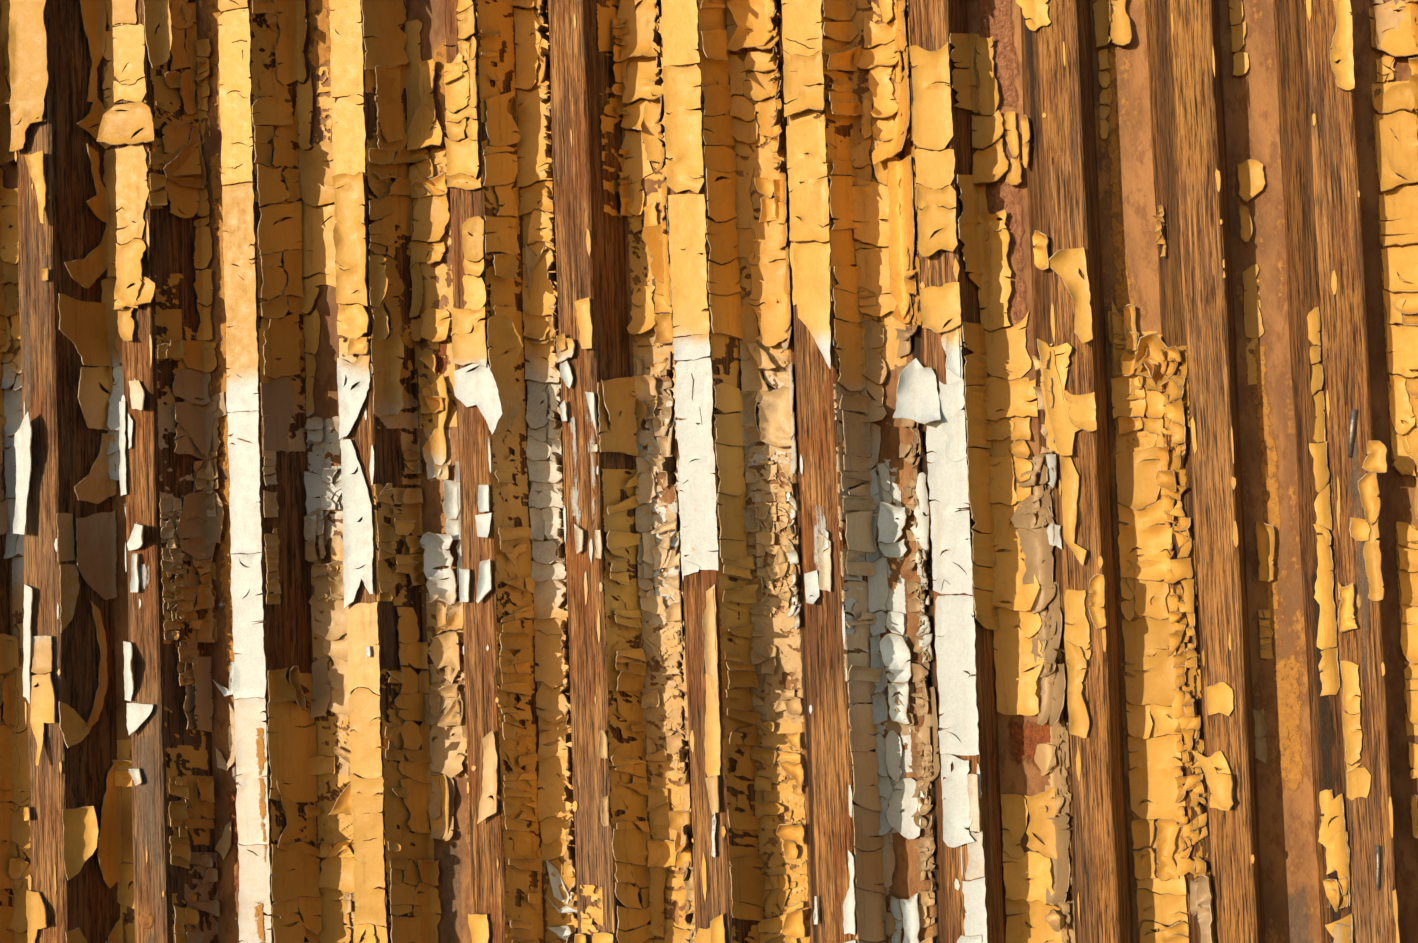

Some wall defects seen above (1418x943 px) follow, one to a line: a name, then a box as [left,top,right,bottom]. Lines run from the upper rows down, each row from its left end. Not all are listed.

corrosion [978,0,1019,107]
peeling [1092,0,1132,139]
peeling [1228,0,1249,76]
corrosion [990,176,1027,320]
peeling [1153,205,1166,257]
peeling [1237,159,1265,242]
peeling [1242,264,1265,385]
peeling [0,0,1107,943]
peeling [1307,0,1418,943]
peeling [1255,521,1275,582]
peeling [1107,301,1234,943]
peeling [1253,709,1267,763]